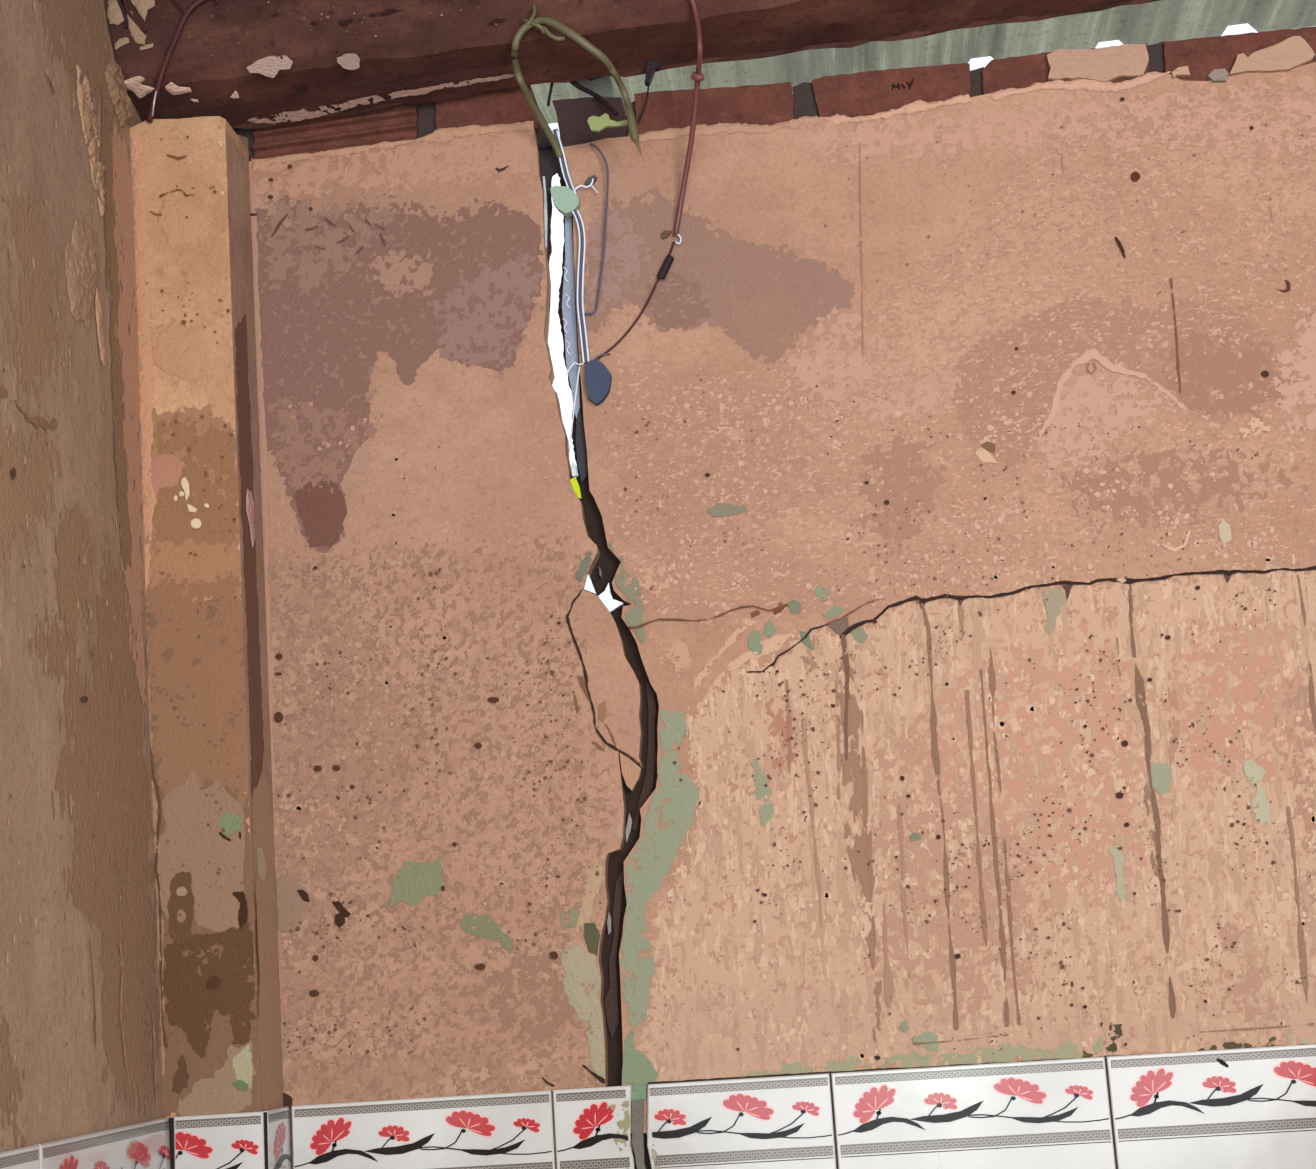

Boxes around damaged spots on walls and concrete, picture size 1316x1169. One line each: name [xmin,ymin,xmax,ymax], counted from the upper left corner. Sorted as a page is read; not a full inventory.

spalling [247,55,293,78]
spalling [337,53,360,70]
damp [581,152,856,366]
crack [1170,278,1181,393]
damp [0,0,548,1121]
peeling [607,542,692,677]
crack [543,147,789,1087]
damp [596,372,834,590]
damp [642,291,1316,1081]
crack [747,566,1316,673]
peeling [390,563,1316,1087]
crack [627,1133,651,1169]